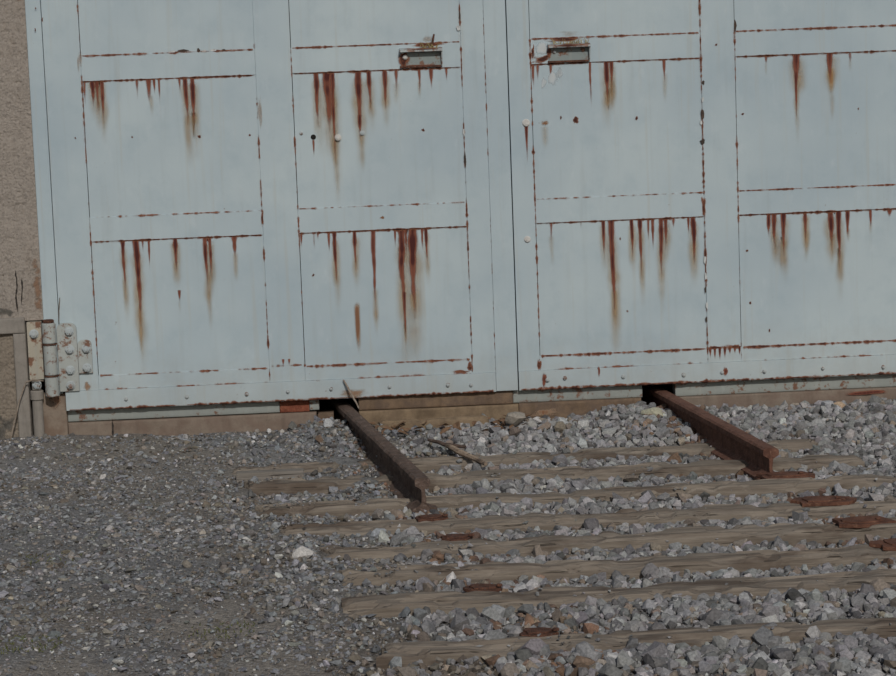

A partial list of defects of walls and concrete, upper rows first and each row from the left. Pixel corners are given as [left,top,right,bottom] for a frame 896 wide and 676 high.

rust [734,24,896,45]
rust [81,74,252,126]
rust [291,41,463,146]
rust [735,50,896,107]
rust [525,0,707,319]
rust [737,181,896,256]
rust [90,180,264,337]
rust [297,202,469,329]
rust [522,327,896,390]